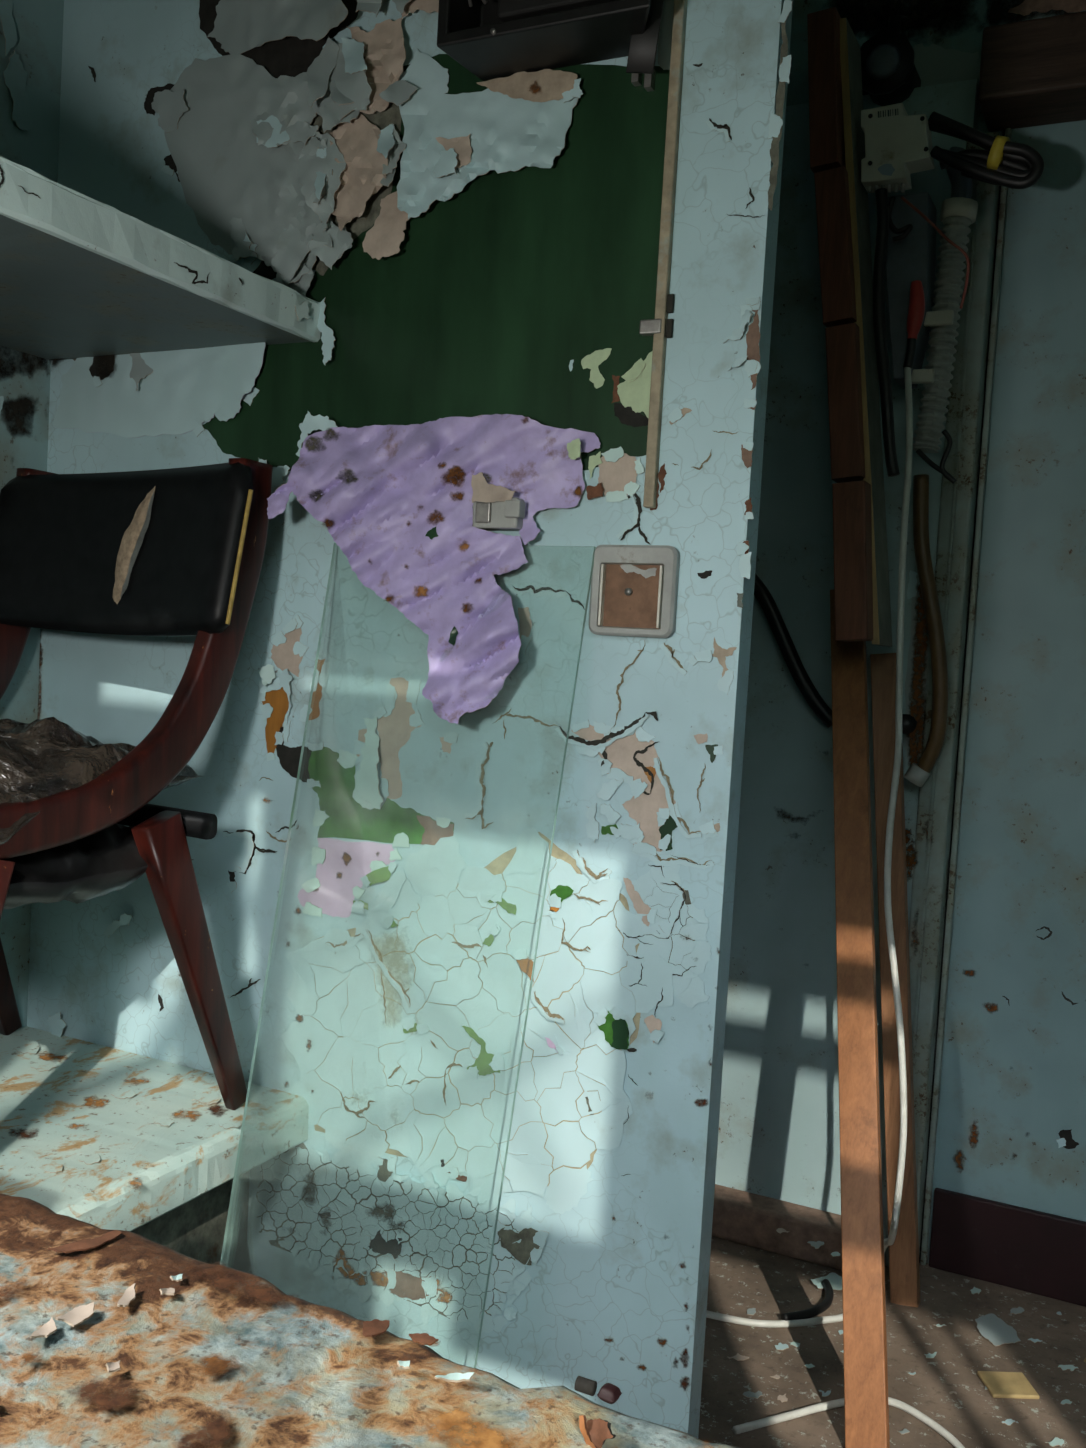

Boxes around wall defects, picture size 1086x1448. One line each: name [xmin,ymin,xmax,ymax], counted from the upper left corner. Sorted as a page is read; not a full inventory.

peeling [1008,0,1086,16]
peeling [724,297,761,410]
peeling [53,0,682,929]
peeling [741,441,754,468]
peeling [744,498,754,519]
crack [510,585,585,610]
crack [223,640,715,1333]
corrosion [303,1171,330,1229]
corrosion [368,1204,404,1228]
corrosion [333,1249,388,1287]
corrosion [436,1279,453,1303]
corrosion [673,1349,689,1390]